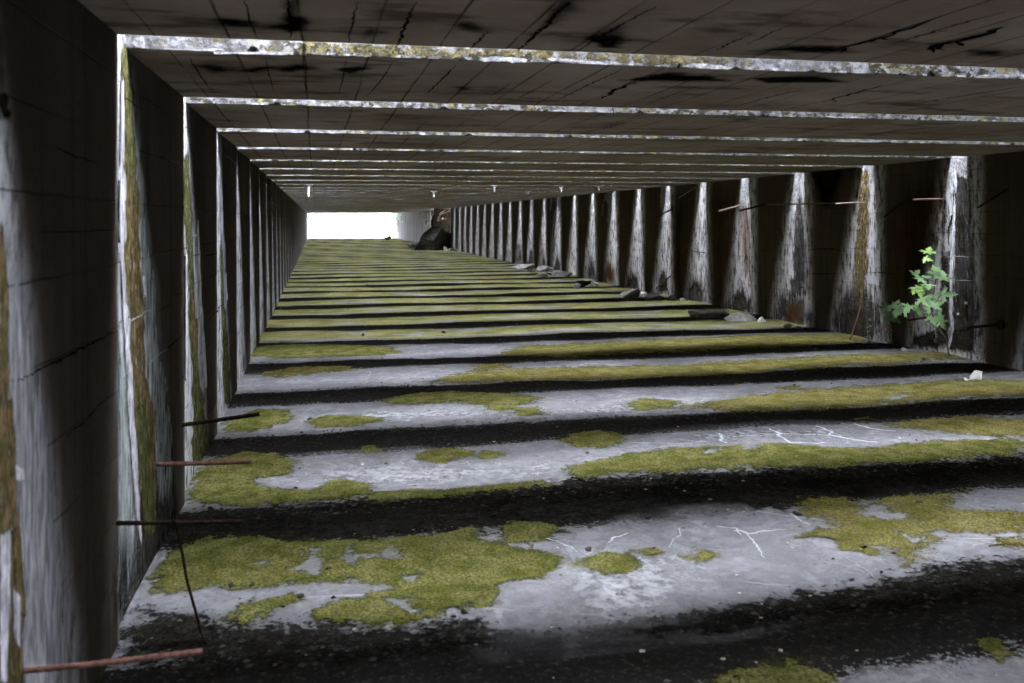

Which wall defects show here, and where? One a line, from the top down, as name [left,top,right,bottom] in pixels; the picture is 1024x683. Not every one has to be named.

crack [244,0,273,88]
crack [286,0,307,92]
crack [339,2,417,96]
crack [425,32,488,95]
crack [518,1,570,51]
crack [578,6,657,51]
crack [838,12,1004,53]
crack [490,69,698,131]
crack [765,424,892,443]
crack [719,513,810,555]